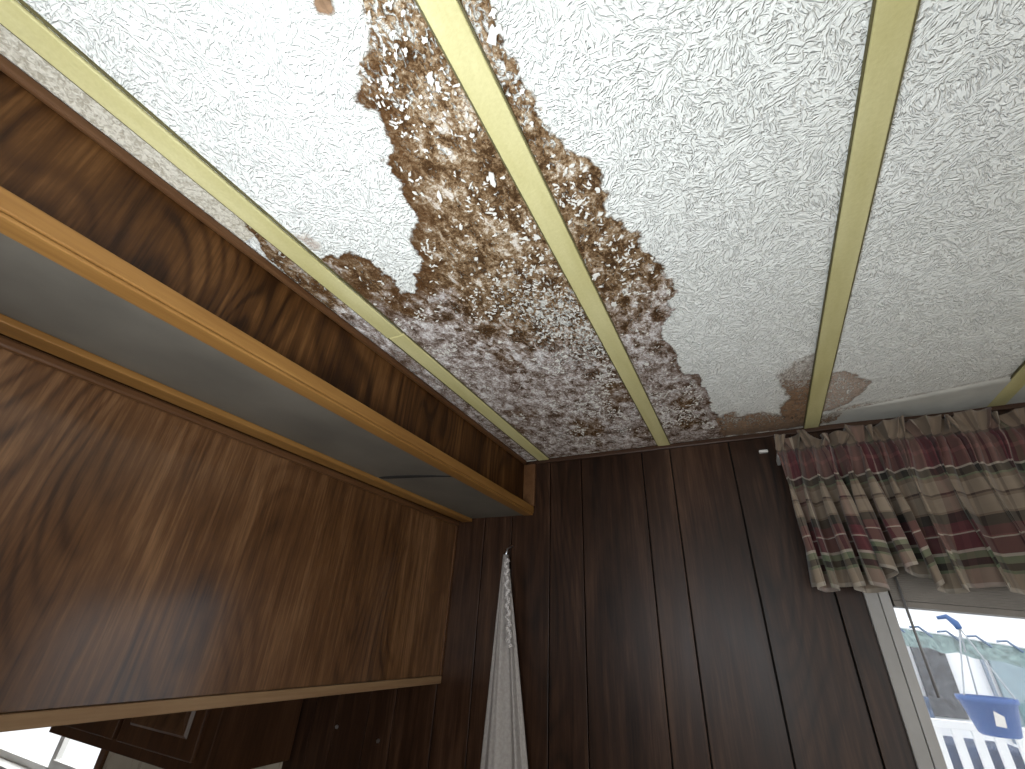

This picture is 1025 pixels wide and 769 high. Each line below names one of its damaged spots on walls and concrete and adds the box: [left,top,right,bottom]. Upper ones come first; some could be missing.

water stain [244,0,811,461]
water stain [820,371,872,424]